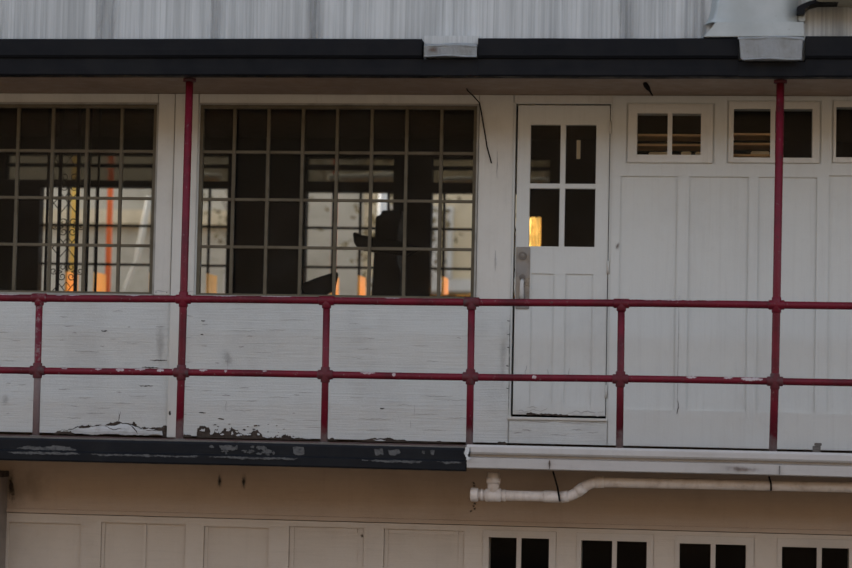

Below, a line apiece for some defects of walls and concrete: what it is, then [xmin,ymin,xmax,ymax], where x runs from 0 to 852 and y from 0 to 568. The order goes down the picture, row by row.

peeling [53,412,167,437]
peeling [10,445,80,455]
peeling [183,424,310,460]
peeling [355,437,471,464]